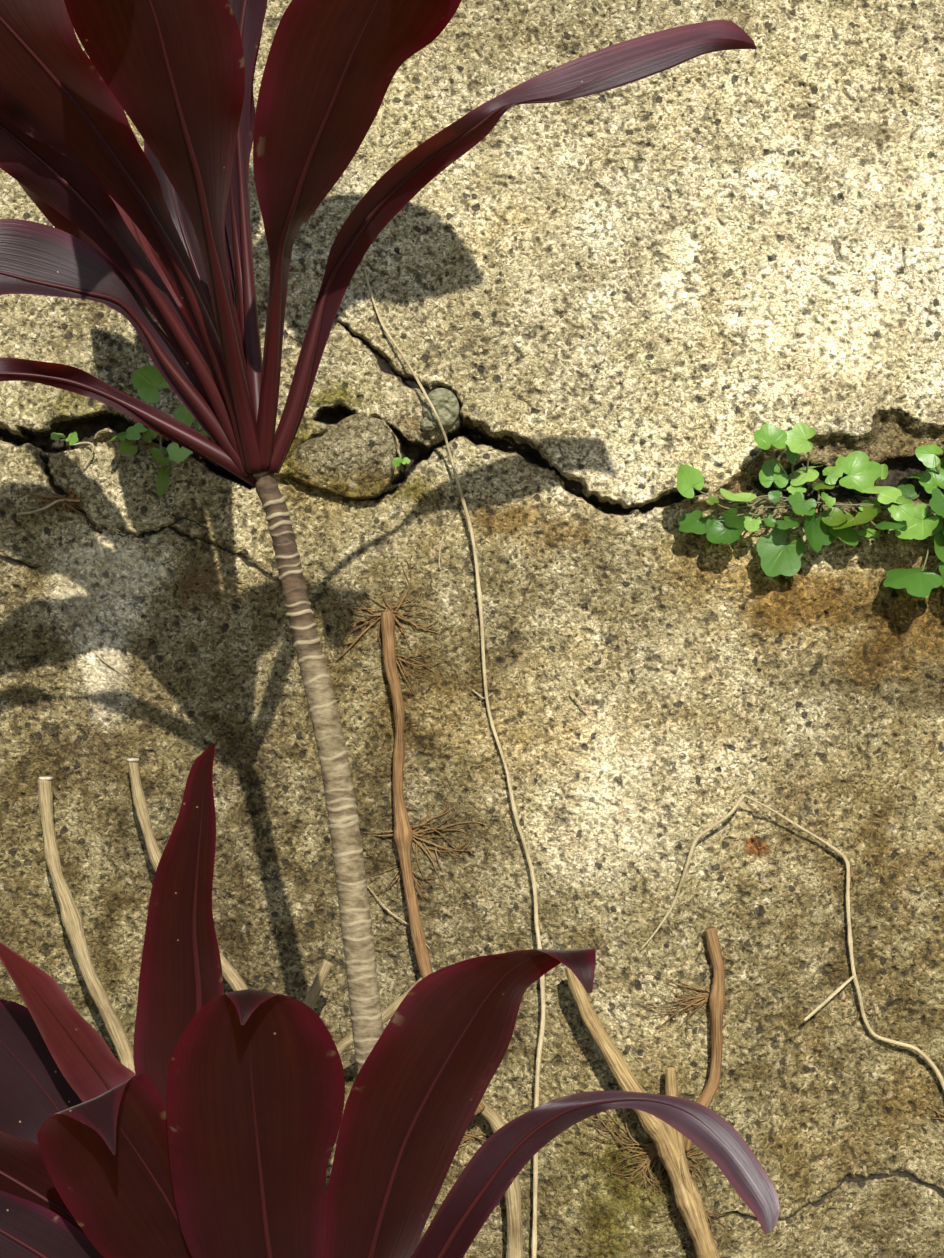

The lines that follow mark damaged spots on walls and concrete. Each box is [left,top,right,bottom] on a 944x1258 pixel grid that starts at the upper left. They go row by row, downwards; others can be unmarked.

crack [337,321,705,514]
crack [0,428,281,582]
damp [753,571,944,712]
crack [712,1171,944,1221]